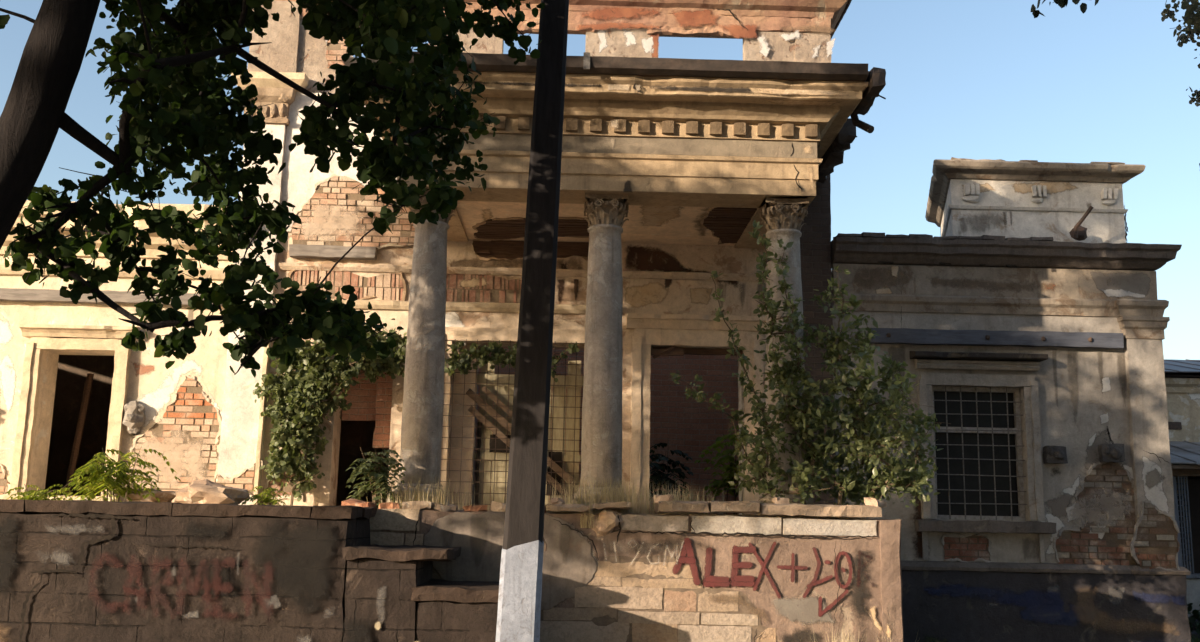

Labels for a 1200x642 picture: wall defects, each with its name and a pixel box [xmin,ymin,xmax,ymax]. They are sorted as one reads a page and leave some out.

peeling [598,30,607,53]
peeling [624,30,654,53]
spalling [291,173,415,250]
spalling [288,261,407,301]
peeling [0,320,16,412]
peeling [1102,377,1111,392]
spalling [120,360,303,502]
spalling [0,464,11,495]
spalling [1040,413,1180,574]